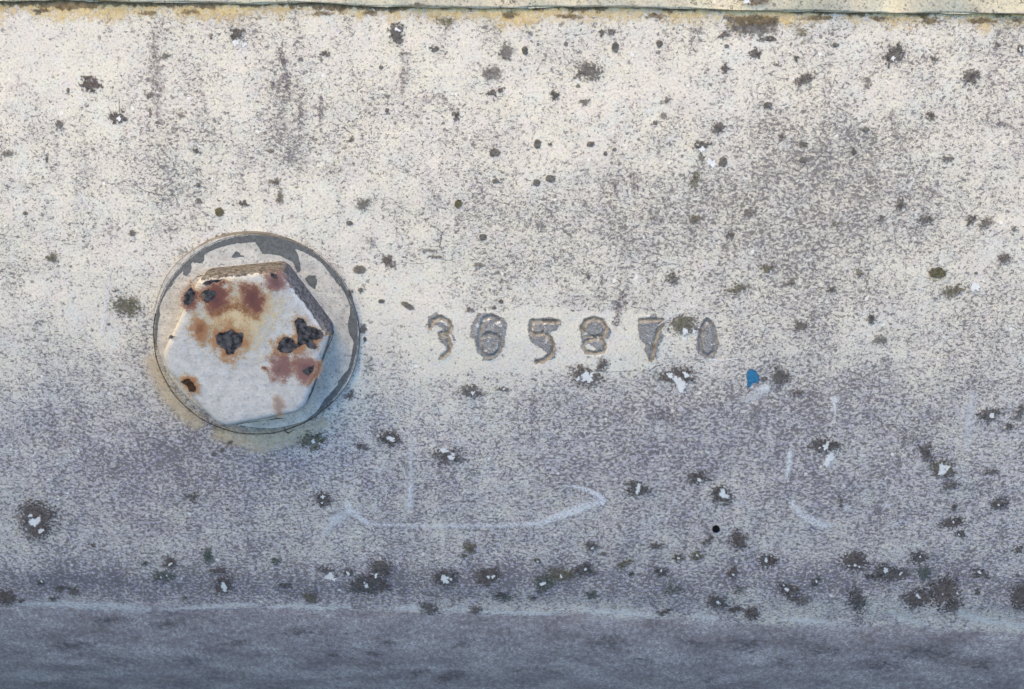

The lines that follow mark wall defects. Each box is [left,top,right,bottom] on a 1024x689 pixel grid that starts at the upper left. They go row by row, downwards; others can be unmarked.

rust [180,270,325,384]
rust [180,375,200,394]